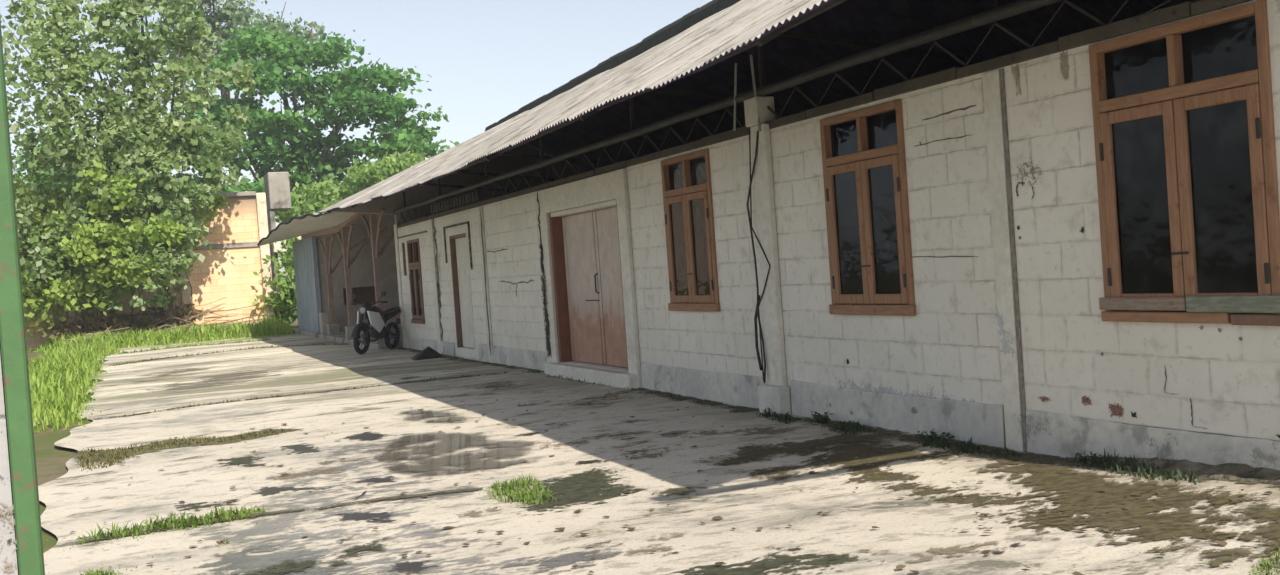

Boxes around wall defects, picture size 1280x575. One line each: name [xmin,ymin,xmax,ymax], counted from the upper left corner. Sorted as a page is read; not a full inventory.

crack [95,193,552,419]
spalling [1108,401,1137,419]